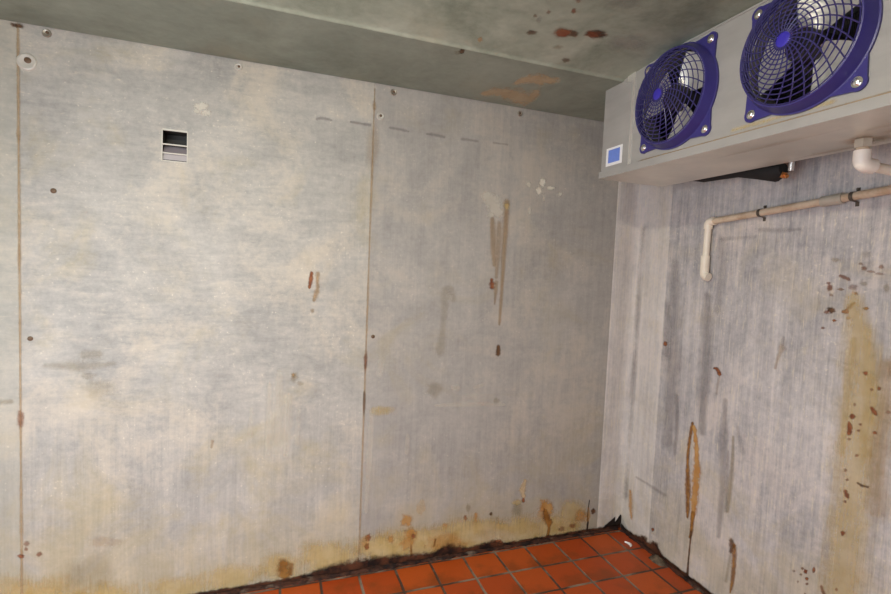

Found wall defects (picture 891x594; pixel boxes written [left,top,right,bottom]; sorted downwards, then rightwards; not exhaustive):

corrosion [554,28,606,38]
corrosion [11,23,24,594]
corrosion [822,292,868,329]
corrosion [685,422,700,538]
water stain [213,569,253,589]
water stain [304,504,585,571]
corrosion [196,501,712,594]